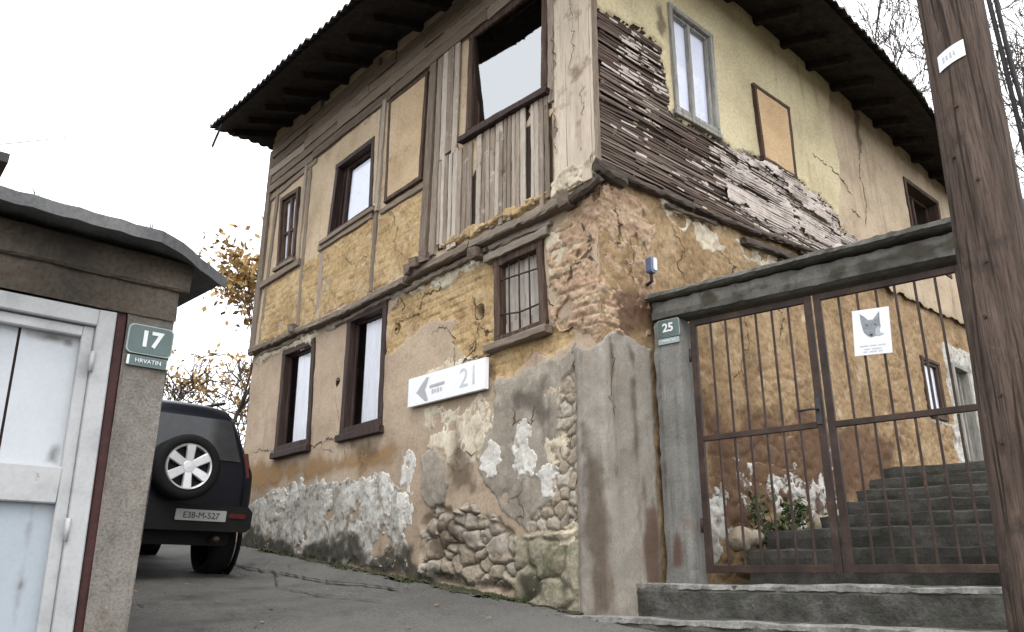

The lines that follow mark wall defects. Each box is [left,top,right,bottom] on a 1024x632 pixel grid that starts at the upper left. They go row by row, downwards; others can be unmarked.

spalling [381,8,858,386]
crack [812,121,867,227]
crack [391,277,494,366]
peeling [241,369,578,594]
leakage [586,461,613,609]